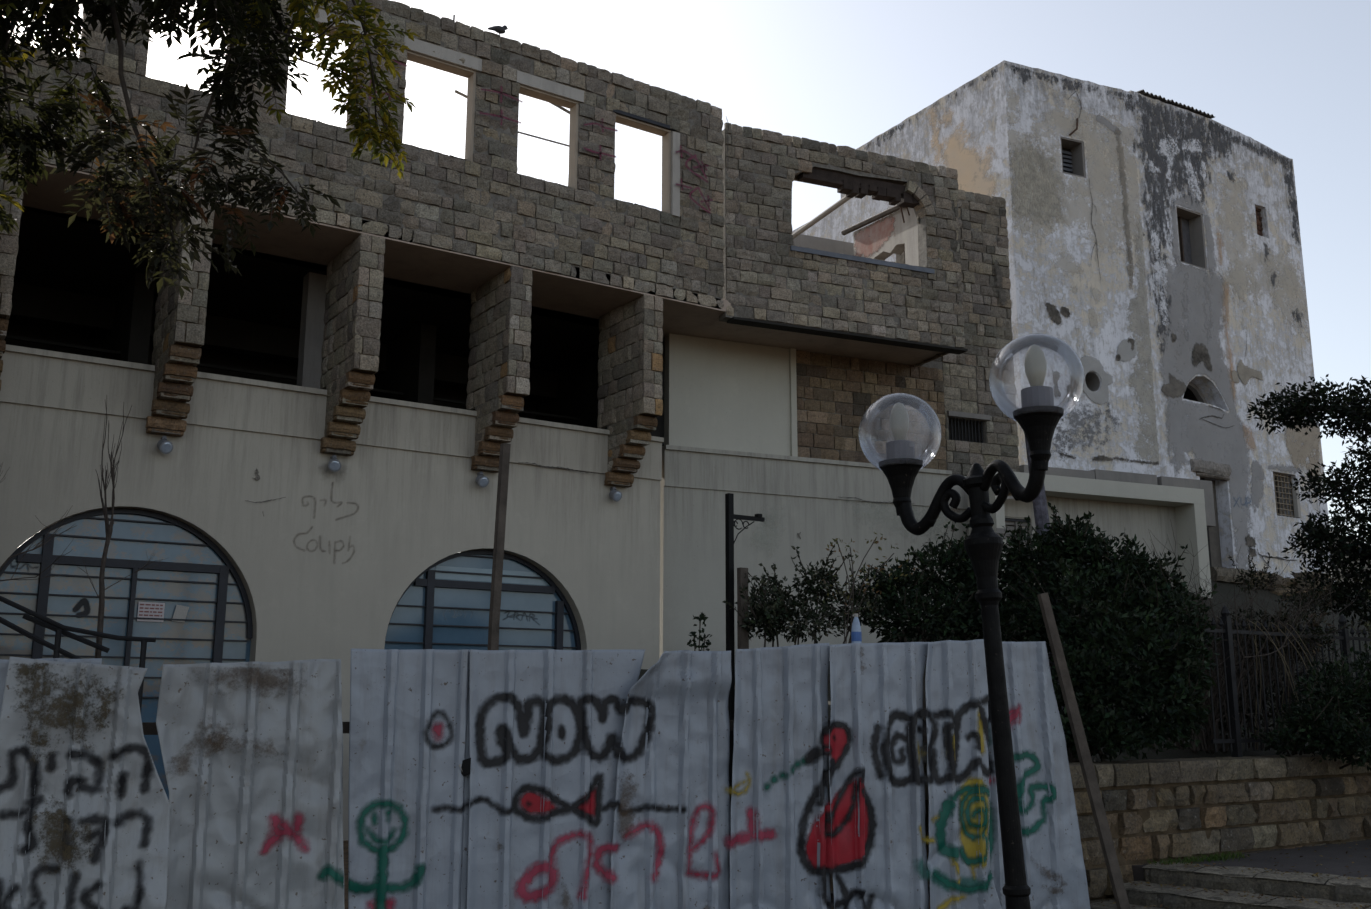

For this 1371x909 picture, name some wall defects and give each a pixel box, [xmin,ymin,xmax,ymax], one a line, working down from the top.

peeling [928,109,1066,233]
water stain [864,64,1301,352]
peeling [1146,134,1308,329]
spalling [1046,302,1070,324]
peeling [1093,129,1187,465]
spalling [1053,371,1070,398]
spalling [1191,343,1213,371]
peeling [1232,360,1263,385]
peeling [1251,425,1321,512]